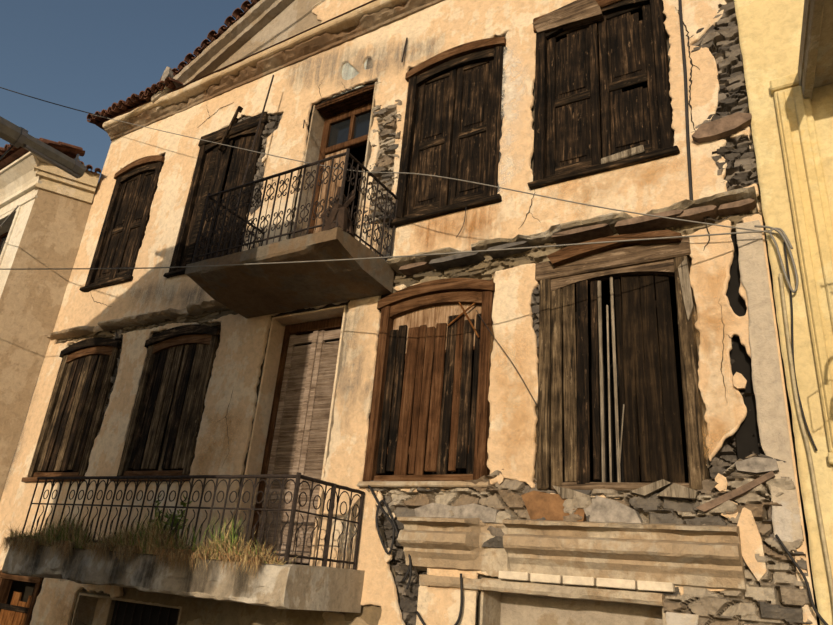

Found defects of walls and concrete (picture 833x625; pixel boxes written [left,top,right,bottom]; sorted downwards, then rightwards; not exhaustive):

flaking render [690,0,750,133]
flaking render [248,114,283,221]
flaking render [640,125,765,235]
flaking render [388,242,567,295]
crack [718,299,753,411]
peeling [715,473,728,492]
crack [709,434,763,492]
peeling [120,587,382,625]
spalling [376,491,429,625]